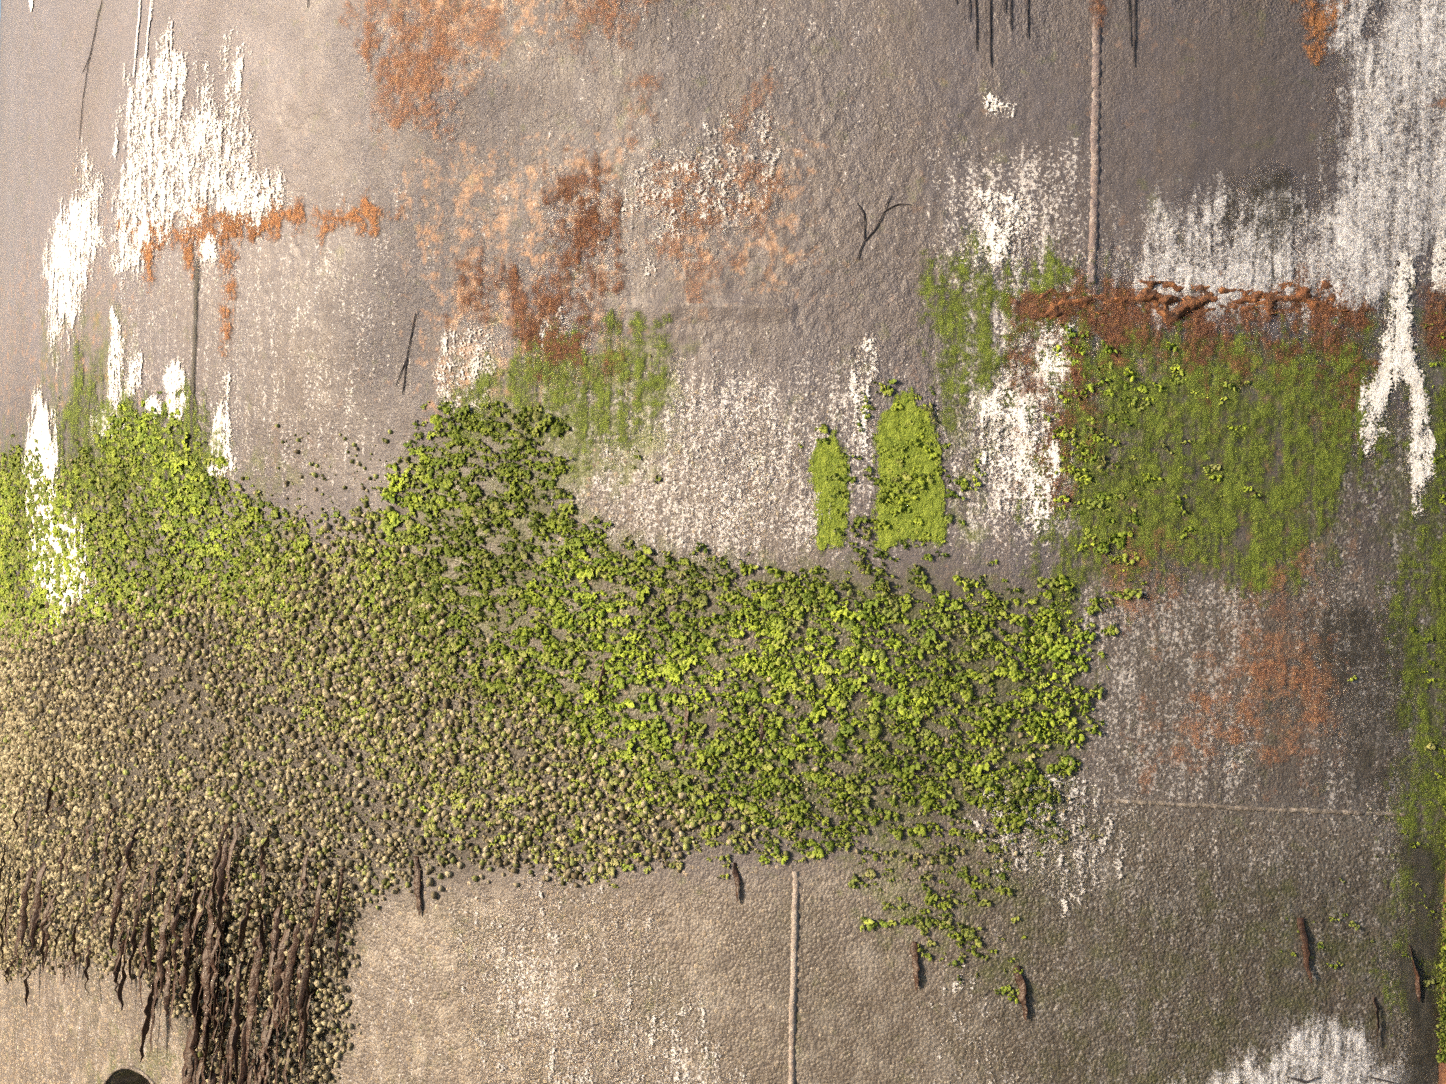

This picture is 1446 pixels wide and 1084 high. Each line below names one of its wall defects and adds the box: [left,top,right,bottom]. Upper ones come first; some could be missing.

corrosion [362,0,498,125]
water stain [955,0,1029,67]
water stain [190,259,198,452]
corrosion [116,194,403,357]
corrosion [456,153,624,363]
corrosion [1007,265,1370,510]
water stain [1251,181,1290,262]
corrosion [1421,282,1446,354]